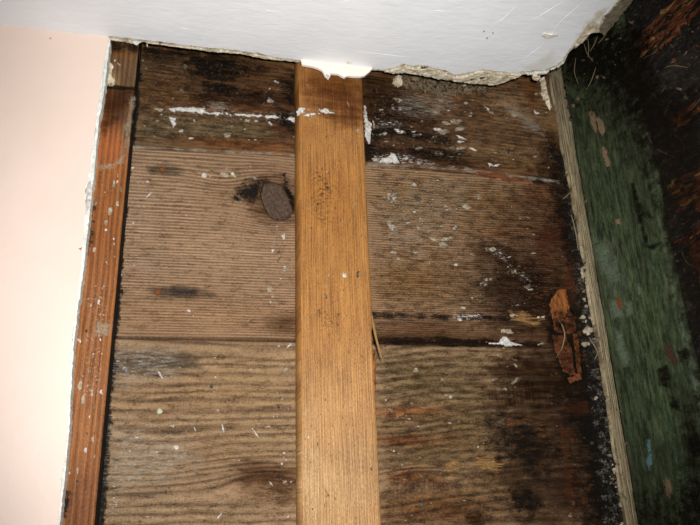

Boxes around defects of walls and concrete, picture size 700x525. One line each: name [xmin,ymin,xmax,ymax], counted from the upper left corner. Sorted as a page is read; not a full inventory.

spalling [384,62,564,86]
water stain [169,75,335,132]
water stain [363,105,461,161]
mould [564,25,700,361]
water stain [95,43,267,525]
water stain [378,337,501,347]
water stain [372,312,518,321]
water stain [497,136,623,525]